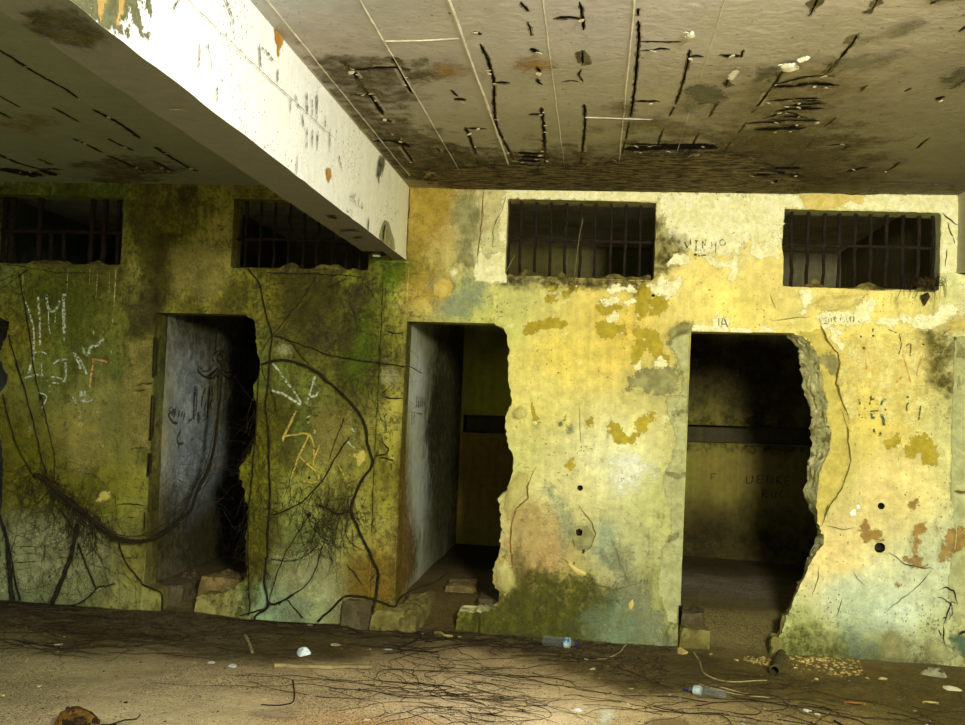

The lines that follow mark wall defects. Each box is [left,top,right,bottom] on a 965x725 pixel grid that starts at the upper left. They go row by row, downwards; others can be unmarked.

spalling [23,0,153,48]
crack [189,0,336,140]
rust [275,29,284,57]
spalling [753,56,839,133]
peeling [473,247,579,303]
flaking render [594,253,777,623]
crack [769,292,855,530]
peeling [788,279,965,627]
damp [3,521,104,594]
rust [859,519,884,543]
rust [902,522,928,569]
rust [938,525,965,562]